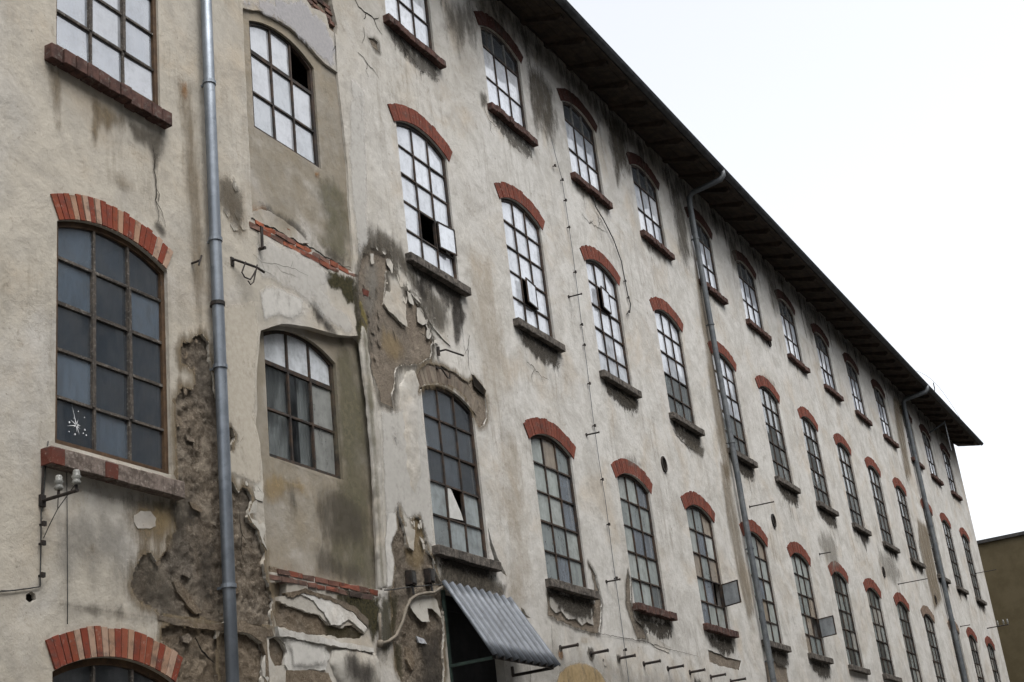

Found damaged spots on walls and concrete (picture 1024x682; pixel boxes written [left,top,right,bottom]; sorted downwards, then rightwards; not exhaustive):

crack [333,0,426,98]
water stain [93,100,116,139]
water stain [131,123,162,156]
crack [153,149,165,222]
water stain [490,0,953,482]
spalling [223,207,489,428]
spalling [128,329,447,682]
spalling [547,561,603,636]